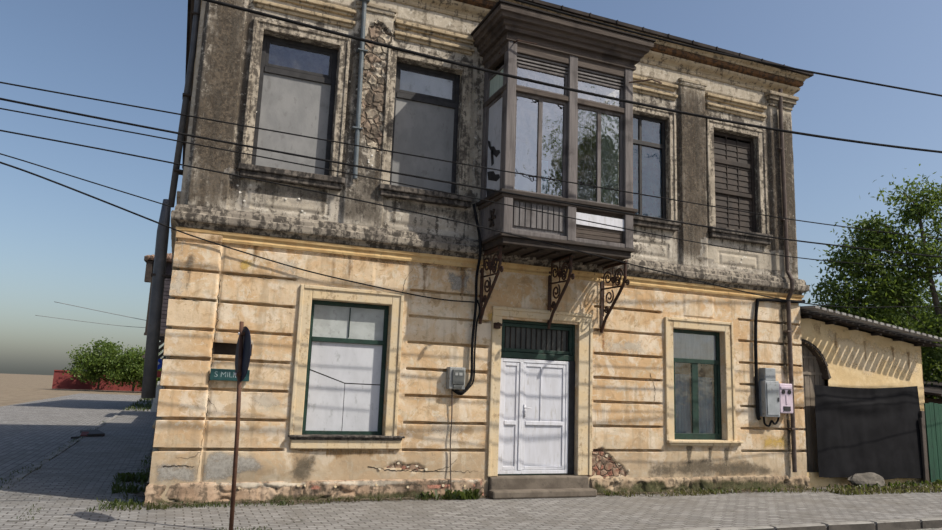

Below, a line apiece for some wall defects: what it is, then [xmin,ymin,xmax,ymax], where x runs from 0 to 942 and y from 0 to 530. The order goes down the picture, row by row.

spalling [361,19,393,167]
water stain [242,182,327,207]
water stain [342,141,383,227]
water stain [329,253,409,275]
crack [163,274,272,477]
flaking render [222,461,428,490]
spalling [585,448,630,478]